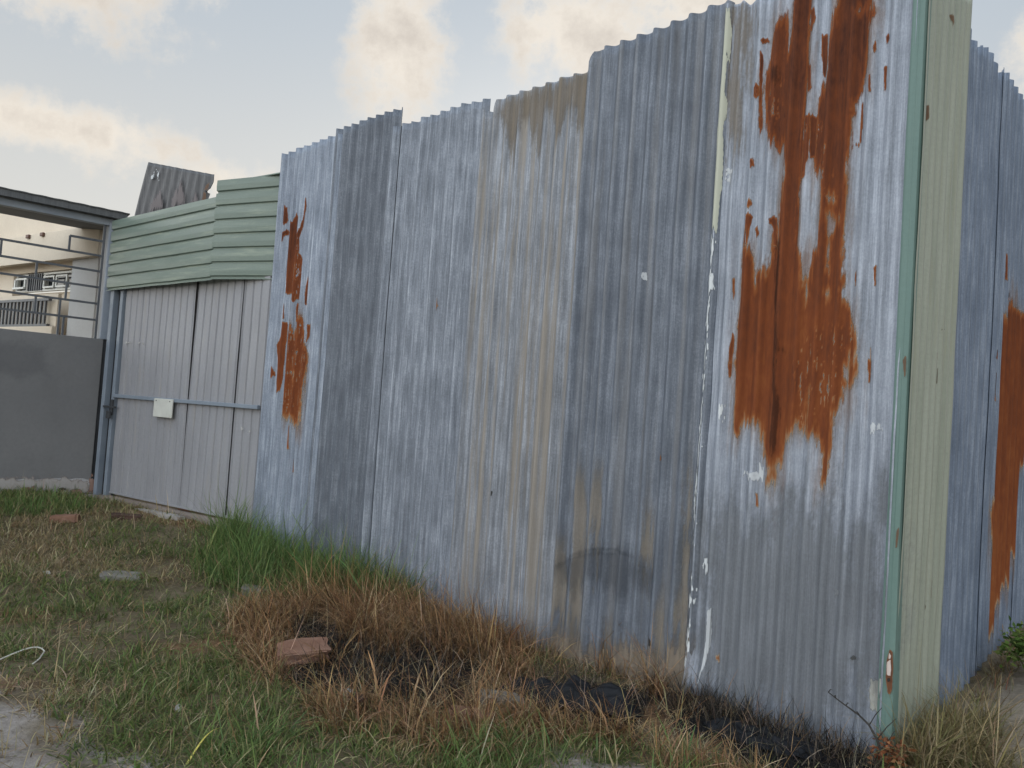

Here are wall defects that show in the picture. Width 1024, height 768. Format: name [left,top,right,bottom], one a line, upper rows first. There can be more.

rust [270,198,311,472]
rust [728,0,889,507]
rust [988,254,1024,642]